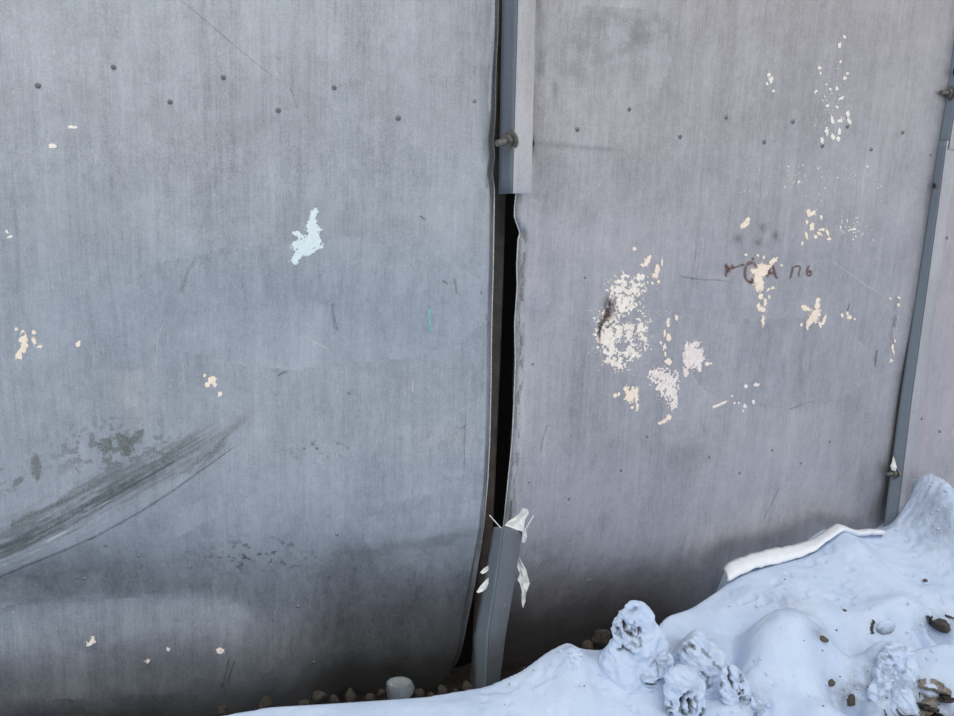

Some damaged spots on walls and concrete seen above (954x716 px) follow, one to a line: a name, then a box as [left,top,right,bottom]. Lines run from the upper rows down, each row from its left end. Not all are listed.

peeling [812,60,853,144]
peeling [288,207,324,265]
corrosion [598,300,613,339]
peeling [588,247,712,425]
peeling [744,253,783,328]
peeling [800,297,827,330]
damp [0,443,195,554]